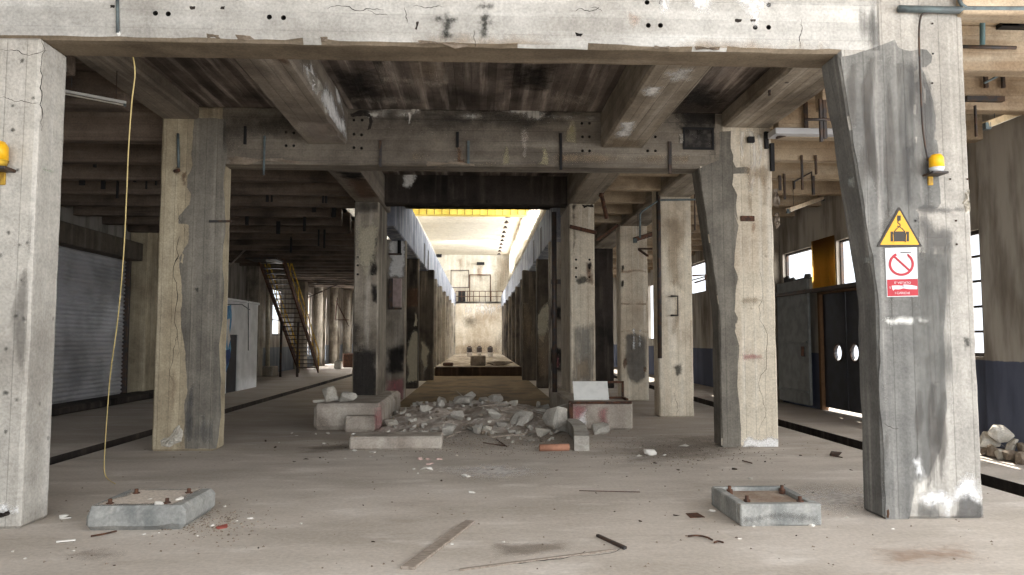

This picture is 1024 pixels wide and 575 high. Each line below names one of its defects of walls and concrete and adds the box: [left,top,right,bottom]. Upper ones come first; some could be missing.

crack [329,5,442,19]
damp [513,65,552,90]
crack [169,205,185,383]
damp [626,329,645,382]
damp [915,461,982,518]